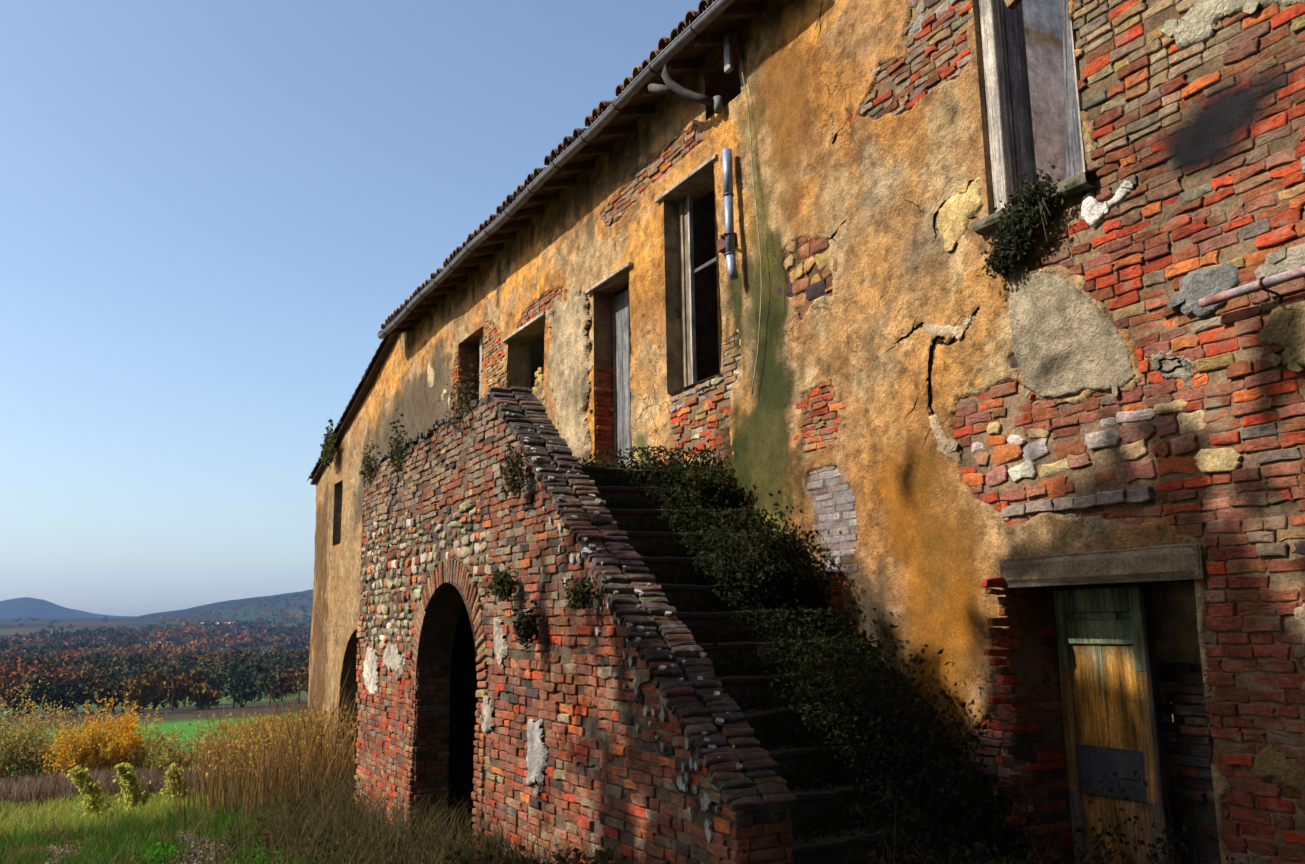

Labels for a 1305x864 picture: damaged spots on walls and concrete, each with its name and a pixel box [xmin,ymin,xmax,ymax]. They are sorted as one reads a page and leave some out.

flaking render [847,0,982,123]
flaking render [601,117,707,230]
flaking render [777,236,837,324]
flaking render [669,336,743,472]
flaking render [793,379,847,454]
crack [872,307,980,448]
flaking render [953,0,1305,864]
flaking render [807,465,860,659]